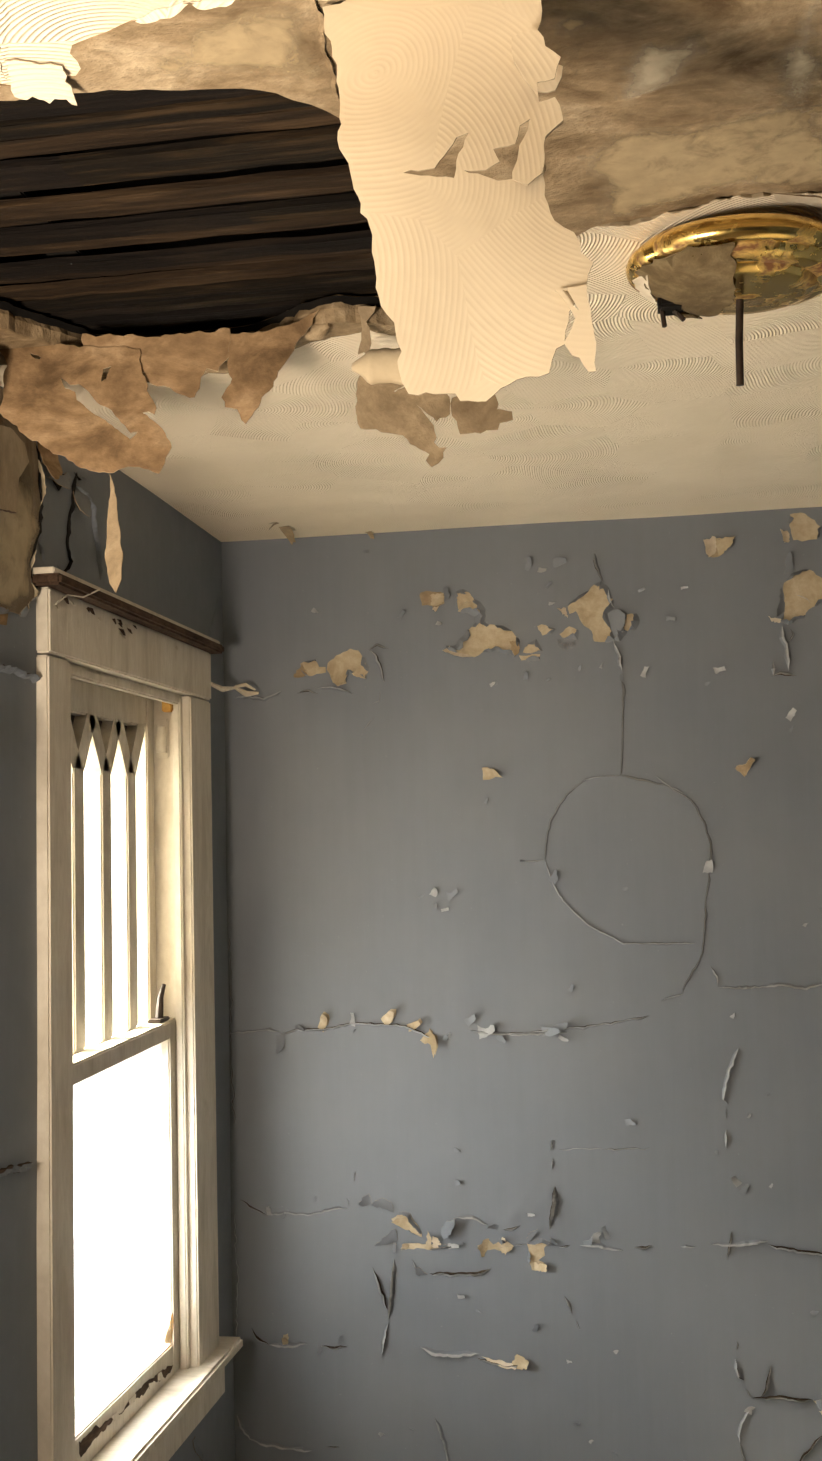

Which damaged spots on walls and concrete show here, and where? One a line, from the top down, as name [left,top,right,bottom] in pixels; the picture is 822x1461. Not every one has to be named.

crack [0,0,11,79]
flaking render [0,0,345,118]
flaking render [407,121,529,181]
flaking render [538,0,822,238]
flaking render [295,322,396,349]
flaking render [0,376,137,639]
peeling [293,649,369,686]
peeling [420,557,640,681]
peeling [768,513,822,625]
crack [228,553,822,1125]
crack [0,1161,32,1177]
peeling [358,1193,557,1272]